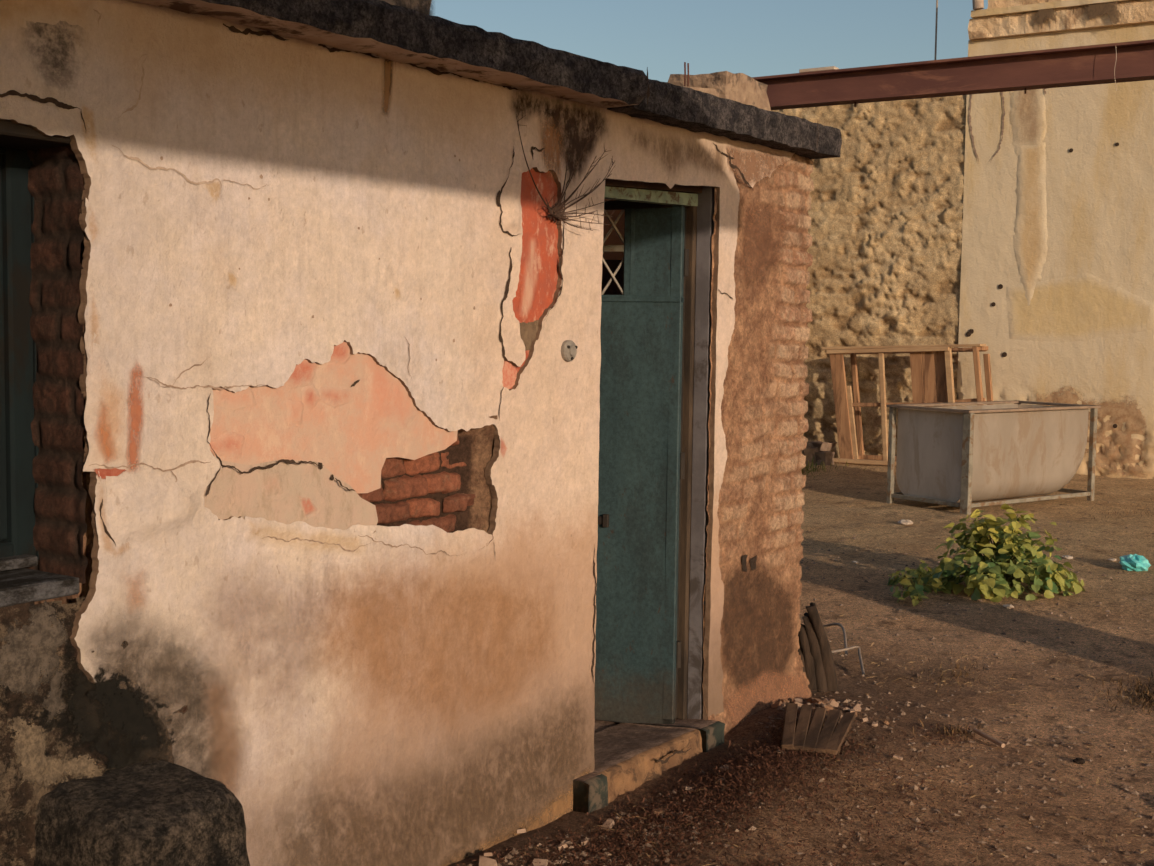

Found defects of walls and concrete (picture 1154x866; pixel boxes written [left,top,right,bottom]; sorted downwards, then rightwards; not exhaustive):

crack [0,90,86,129]
crack [112,145,267,190]
leakage [0,0,787,189]
peeling [502,168,559,389]
peeling [203,341,508,564]
spalling [0,597,116,866]
leakage [59,631,225,782]
leakage [285,524,571,757]
leakage [291,721,575,866]
leakage [723,570,809,727]